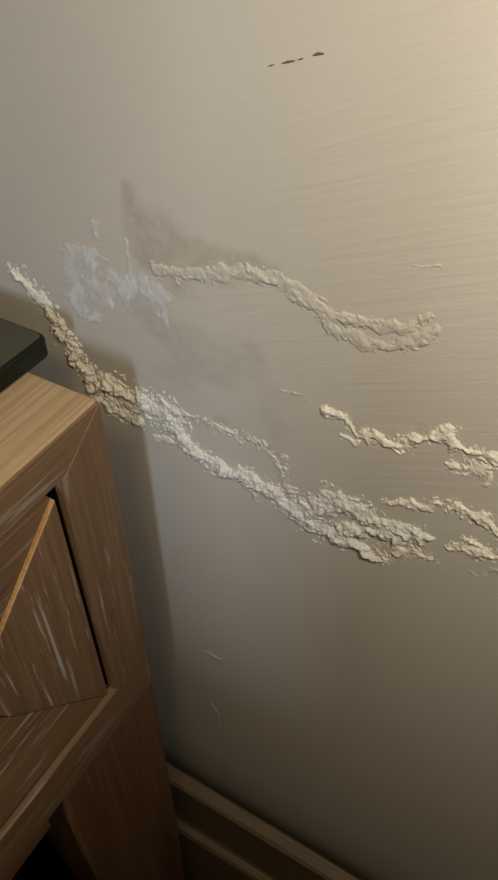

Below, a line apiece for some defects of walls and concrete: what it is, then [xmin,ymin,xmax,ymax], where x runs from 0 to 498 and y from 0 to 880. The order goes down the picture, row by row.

water stain [6,262,498,577]